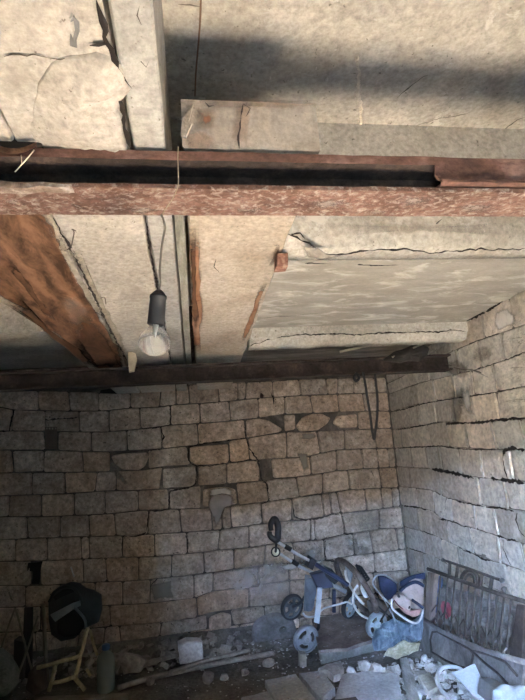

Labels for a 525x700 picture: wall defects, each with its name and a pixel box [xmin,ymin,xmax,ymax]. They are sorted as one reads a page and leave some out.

crack [4,53,64,61]
crack [90,0,130,86]
crack [118,101,131,149]
crack [237,104,251,148]
crack [288,232,525,266]
crack [53,218,128,362]
corrosion [189,240,203,347]
crack [251,301,503,346]
crack [475,352,524,370]
crack [396,417,524,430]
crack [403,445,525,454]
spalling [27,562,42,584]